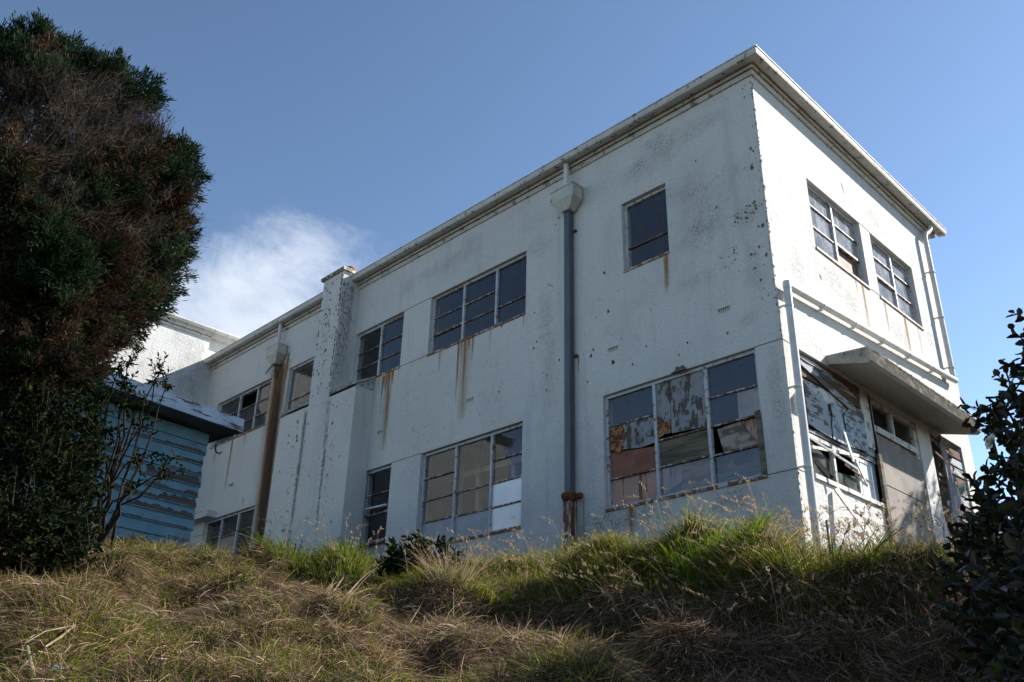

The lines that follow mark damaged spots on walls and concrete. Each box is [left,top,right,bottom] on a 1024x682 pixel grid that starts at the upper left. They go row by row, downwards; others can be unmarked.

spalling [732,82,783,337]
spalling [310,268,352,406]
peeling [94,432,205,540]